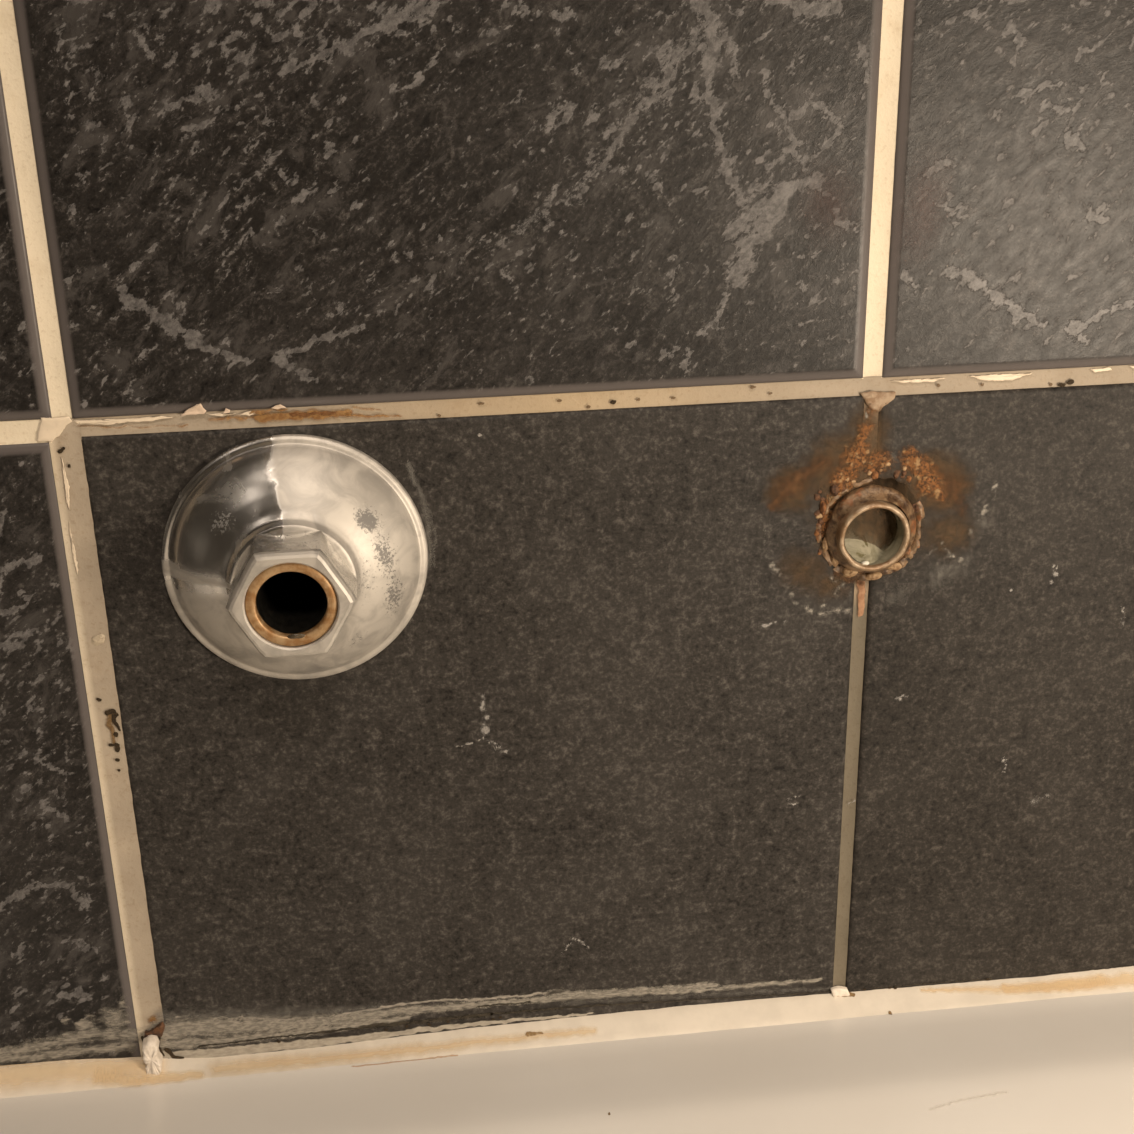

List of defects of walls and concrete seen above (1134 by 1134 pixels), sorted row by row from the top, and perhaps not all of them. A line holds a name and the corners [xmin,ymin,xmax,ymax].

rust [209,407,401,423]
rust [769,407,969,617]